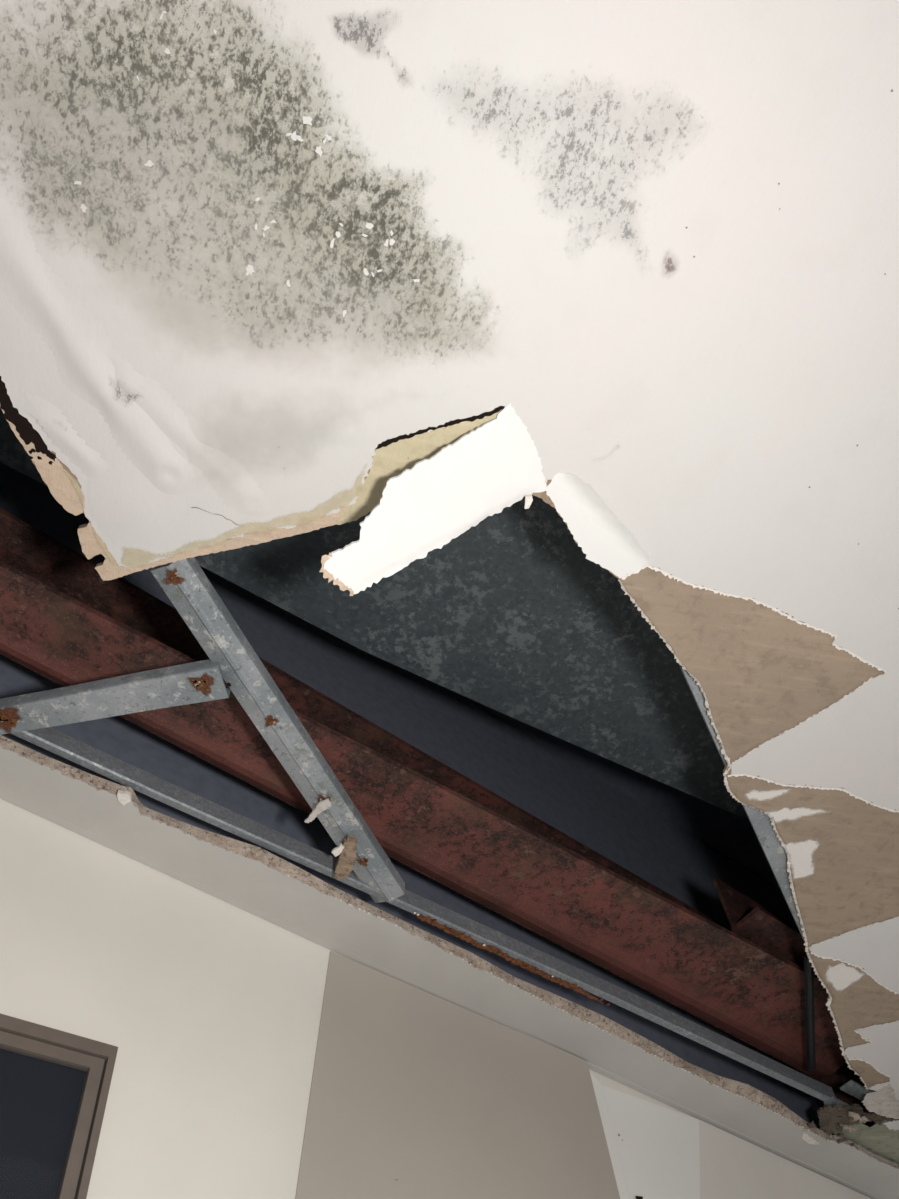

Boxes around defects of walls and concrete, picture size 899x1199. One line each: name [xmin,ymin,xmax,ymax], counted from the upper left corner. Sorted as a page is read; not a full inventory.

water stain [0,0,480,345]
water stain [463,88,684,239]
peeling [319,403,547,596]
rust [163,569,185,585]
rust [0,708,21,733]
rust [188,674,214,695]
peeling [621,566,899,1089]
spalling [0,735,899,1169]
rust [413,912,610,1006]